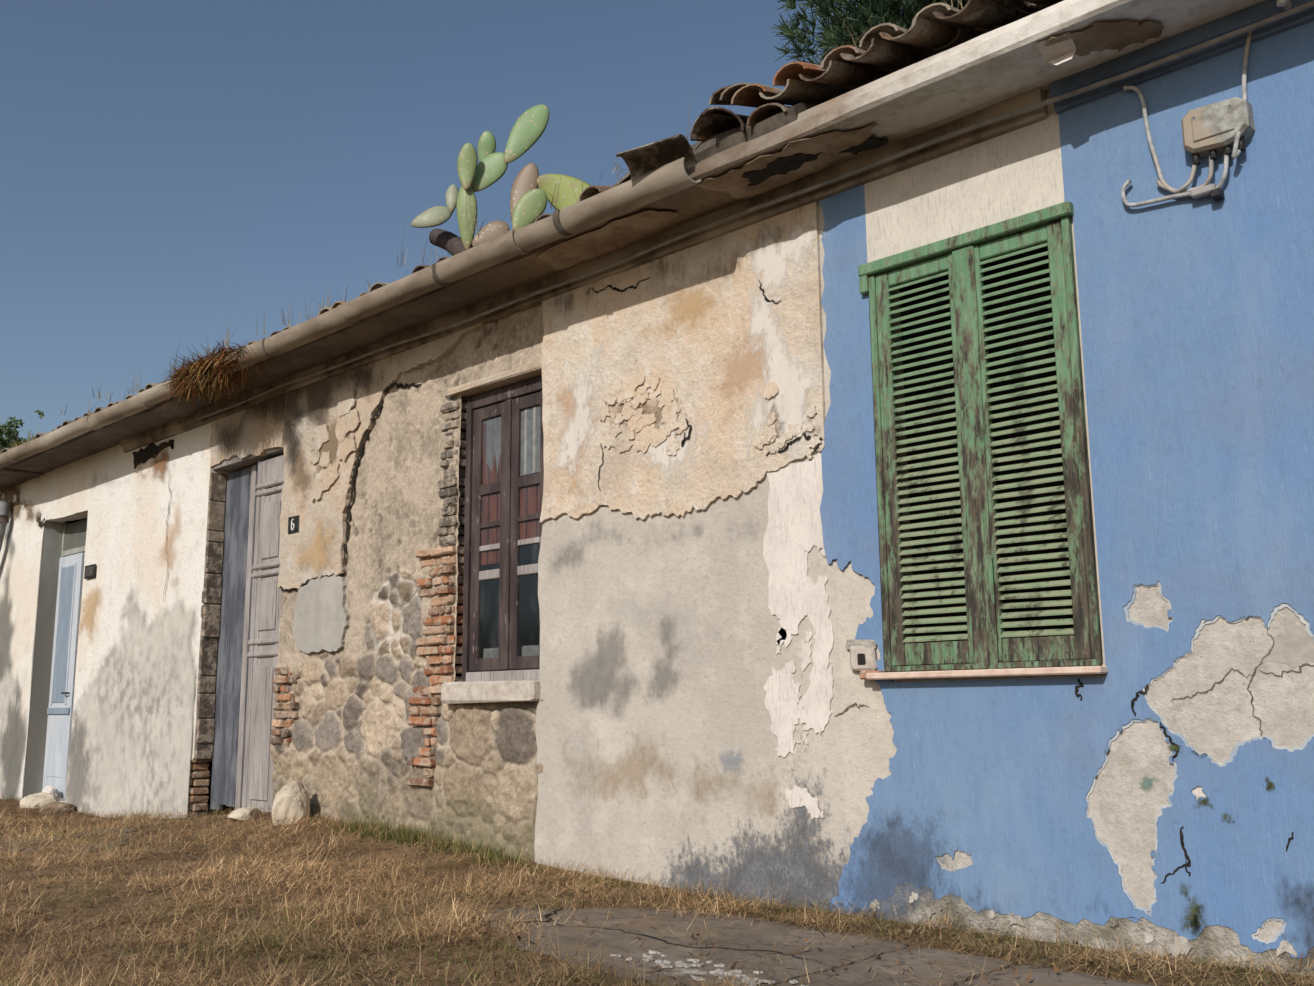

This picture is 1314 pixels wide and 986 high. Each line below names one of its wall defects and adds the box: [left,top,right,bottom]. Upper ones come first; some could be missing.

crack [586,277,650,295]
peeling [210,323,486,590]
crack [281,382,422,592]
peeling [537,20,1314,958]
leakage [0,531,24,800]
leakage [66,592,195,818]
leakage [572,635,631,710]
leakage [652,624,689,692]
leakage [662,777,939,922]
crack [1161,826,1191,883]